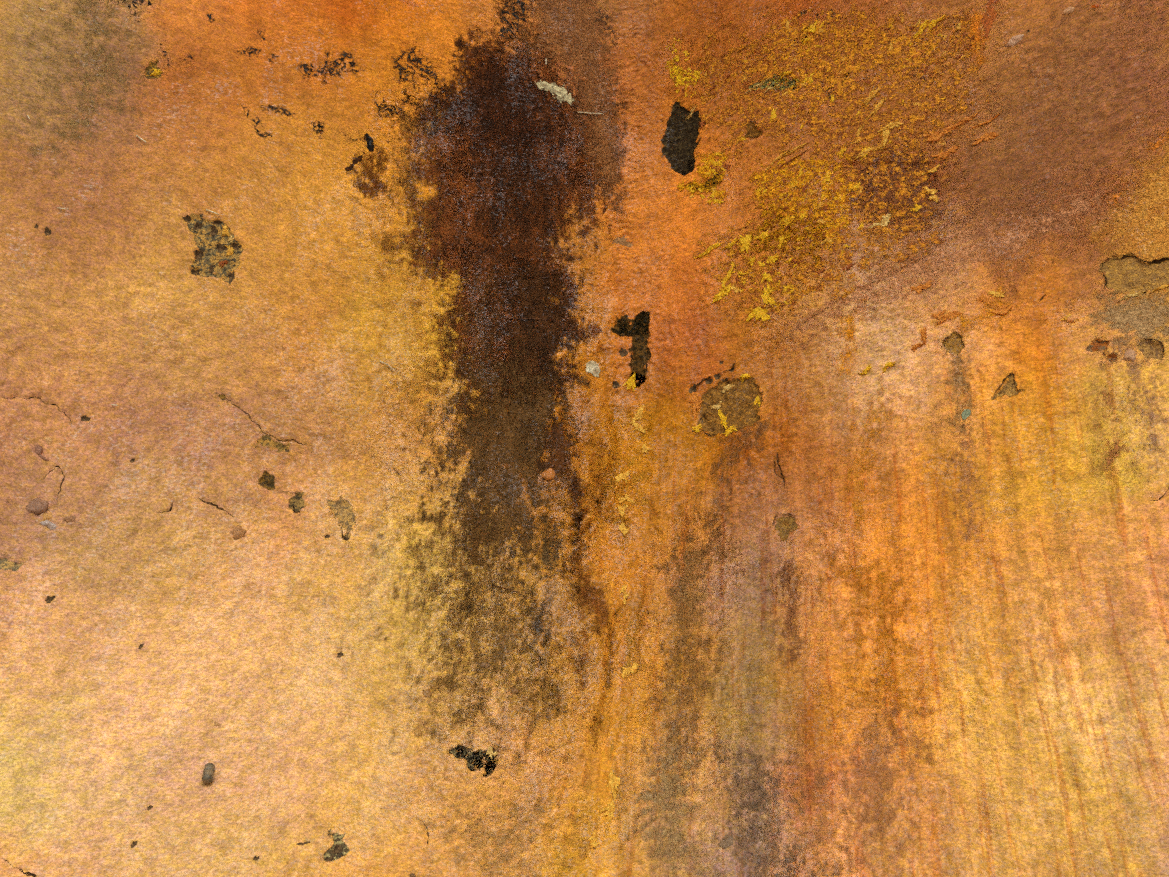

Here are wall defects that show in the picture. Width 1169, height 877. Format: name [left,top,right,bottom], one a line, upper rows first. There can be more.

peeling [661,0,1000,358]
spalling [182,213,244,284]
spalling [1099,252,1169,303]
spalling [611,311,651,392]
peeling [630,405,653,454]
spalling [688,361,763,437]
peeling [858,361,896,376]
spalling [1086,339,1118,361]
spalling [1138,336,1164,359]
peeling [615,471,636,538]
rust [540,414,622,717]
spalling [448,745,499,777]